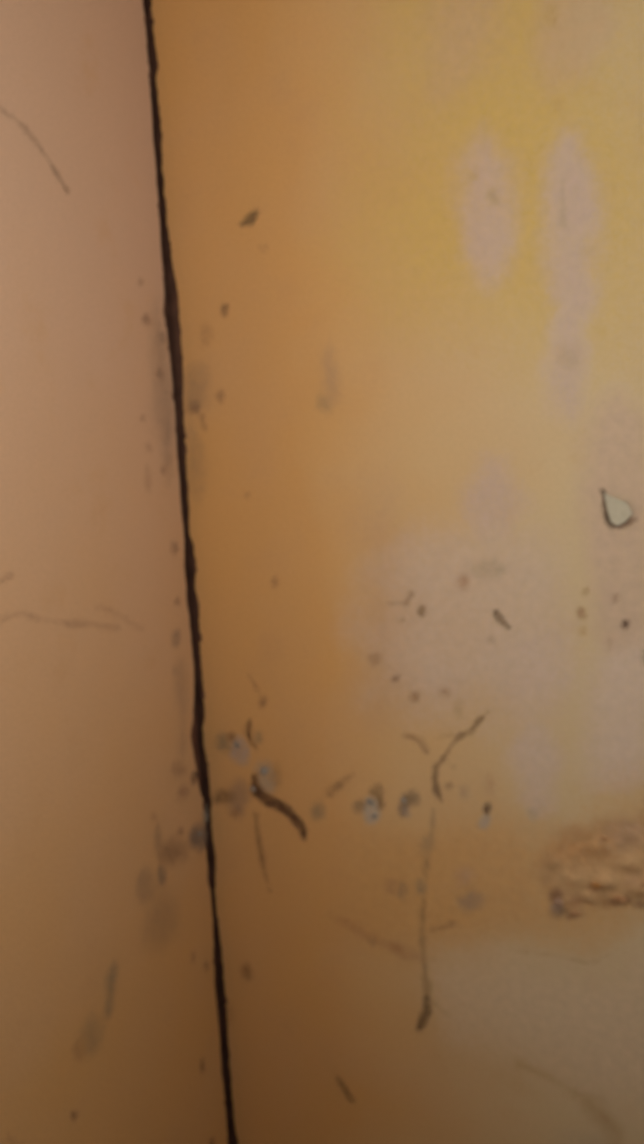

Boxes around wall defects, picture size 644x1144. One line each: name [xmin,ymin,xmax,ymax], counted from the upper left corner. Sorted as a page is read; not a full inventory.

crack [143,0,238,1144]
peeling [597,485,639,530]
crack [245,718,309,894]
crack [402,709,489,1033]